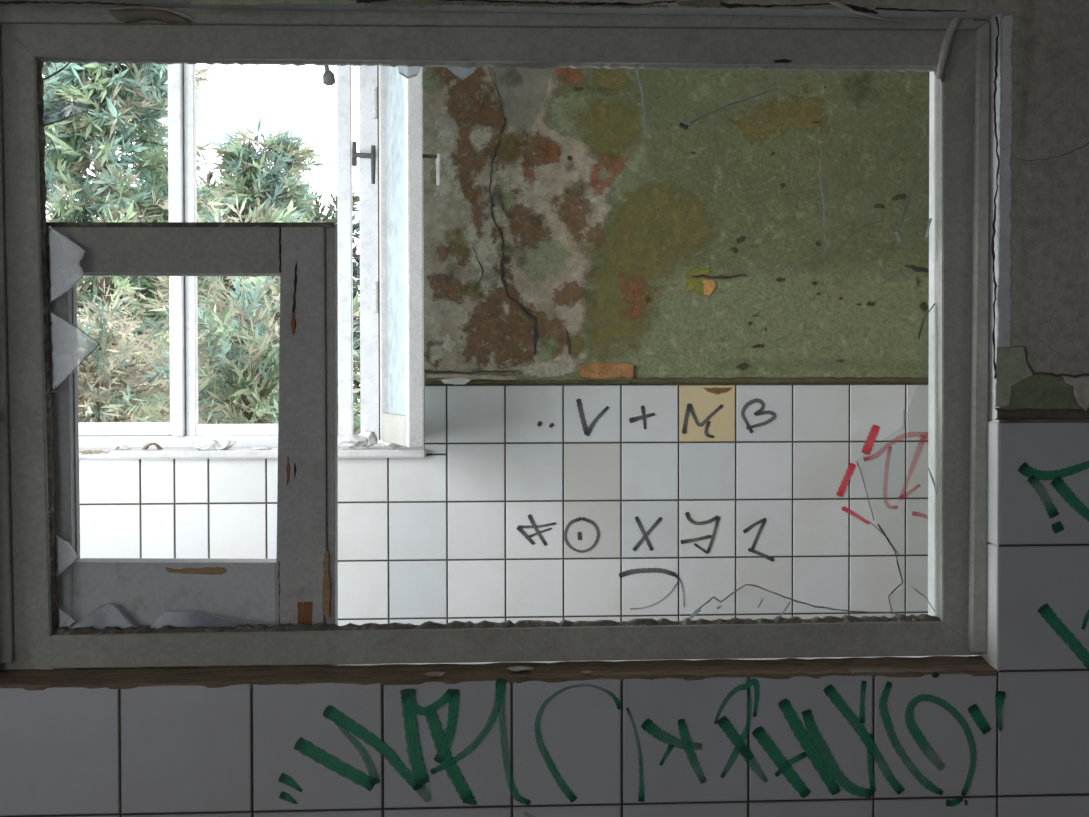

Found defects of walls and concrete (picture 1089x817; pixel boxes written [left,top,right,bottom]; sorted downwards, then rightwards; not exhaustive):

crack [424,66,538,374]
spalling [423,66,648,385]
crack [563,327,571,355]
peeling [996,346,1089,411]